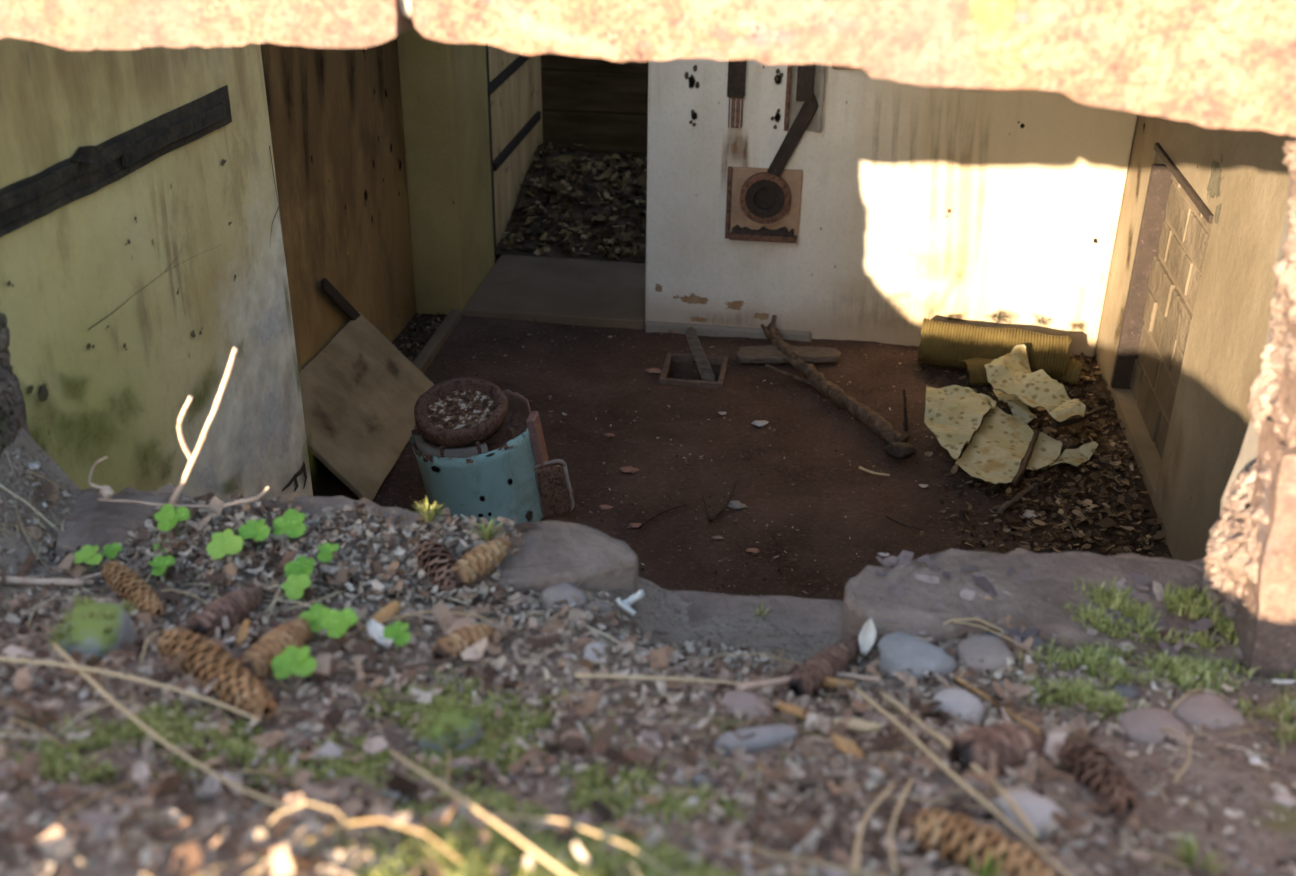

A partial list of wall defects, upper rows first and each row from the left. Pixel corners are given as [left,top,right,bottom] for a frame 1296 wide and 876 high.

peeling [655,284,708,322]
peeling [727,301,769,320]
damp [991,311,1011,324]